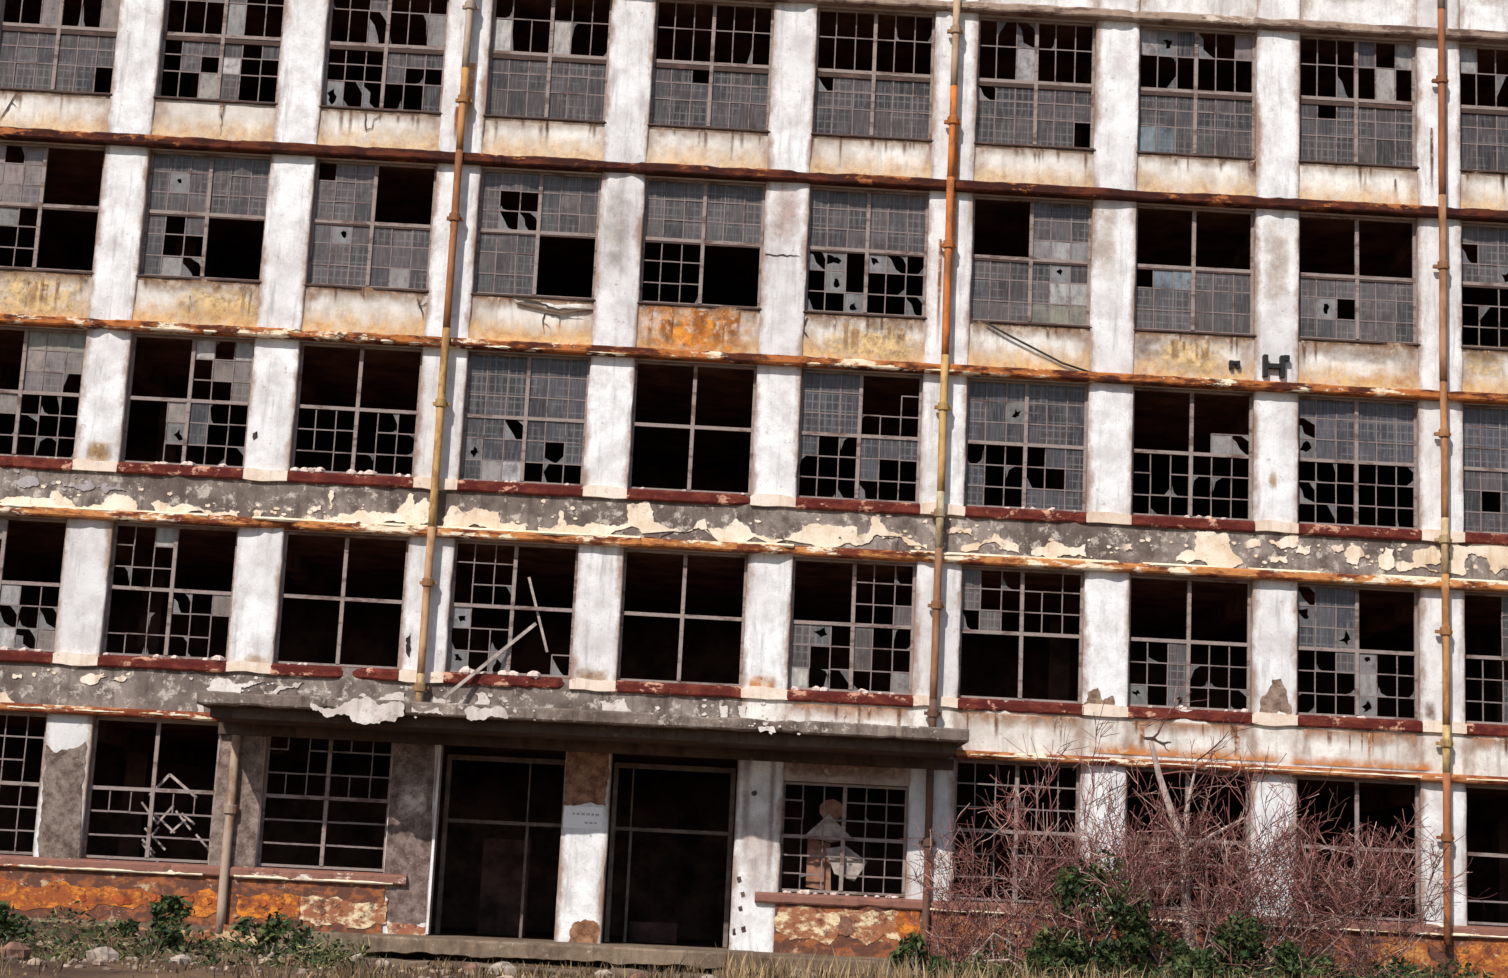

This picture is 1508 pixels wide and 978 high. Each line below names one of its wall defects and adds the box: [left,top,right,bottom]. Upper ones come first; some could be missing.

corrosion [643,305,756,352]
peeling [0,470,1152,558]
peeling [1170,531,1508,576]
peeling [0,669,56,703]
peeling [80,672,131,685]
peeling [189,675,302,712]
peeling [310,686,535,725]
peeling [600,698,632,712]
peeling [701,699,846,735]
spalling [1259,679,1292,715]